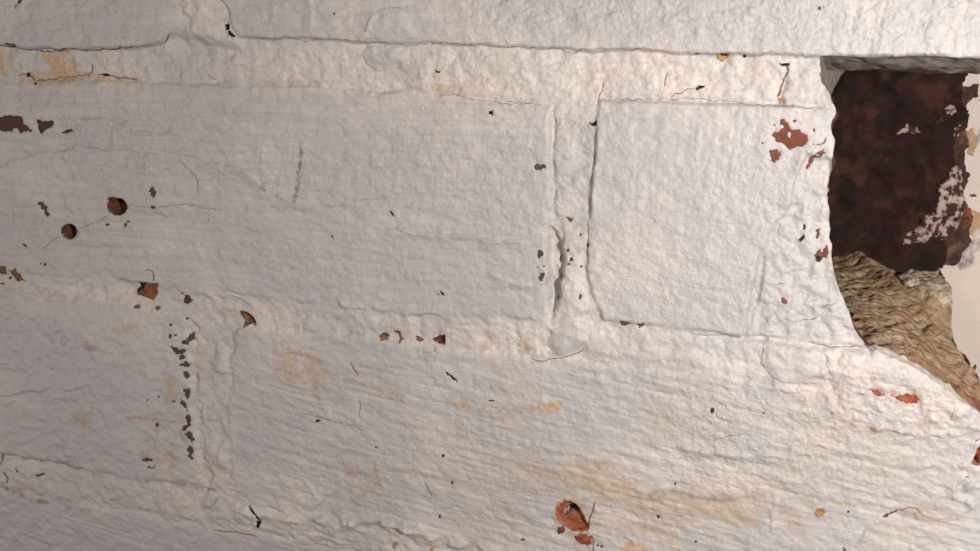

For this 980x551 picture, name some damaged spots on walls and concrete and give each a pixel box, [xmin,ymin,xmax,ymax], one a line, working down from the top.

peeling [0,115,73,134]
spalling [762,55,980,413]
peeling [557,503,592,546]